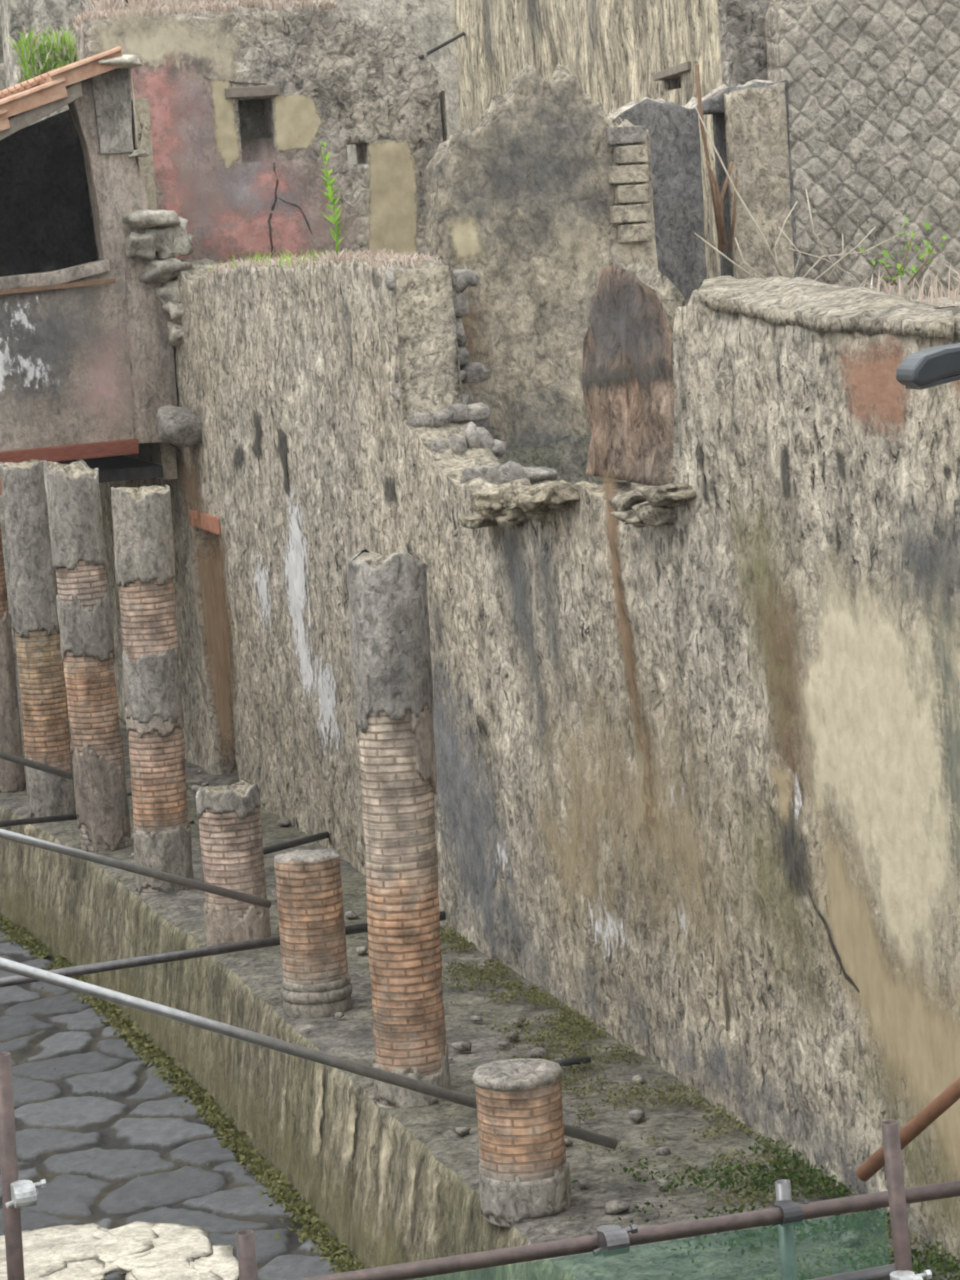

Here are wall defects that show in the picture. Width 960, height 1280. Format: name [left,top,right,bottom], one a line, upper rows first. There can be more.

peeling [0,296,60,392]
crack [808,888,860,993]